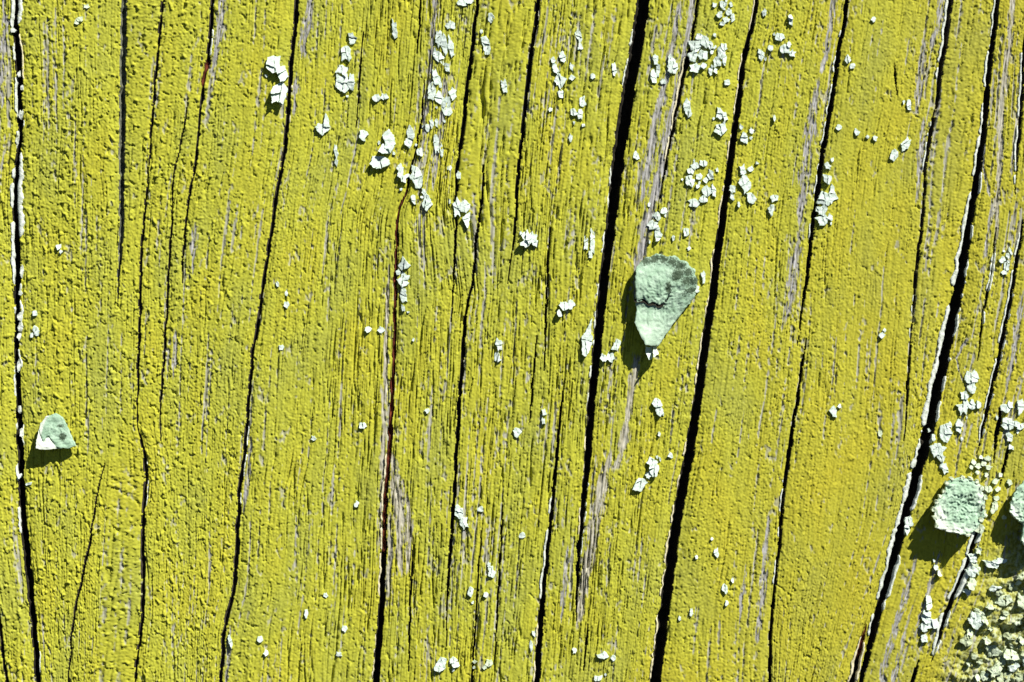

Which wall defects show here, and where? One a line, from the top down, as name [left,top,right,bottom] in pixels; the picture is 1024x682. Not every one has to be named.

crack [10,0,41,682]
peeling [36,413,76,450]
crack [117,0,215,682]
crack [219,0,300,682]
peeling [265,56,299,113]
peeling [359,0,461,212]
crack [529,0,650,682]
peeling [560,0,735,627]
crack [649,0,759,682]
peeling [785,0,838,320]
crack [847,0,1024,682]
peeling [927,339,1024,682]